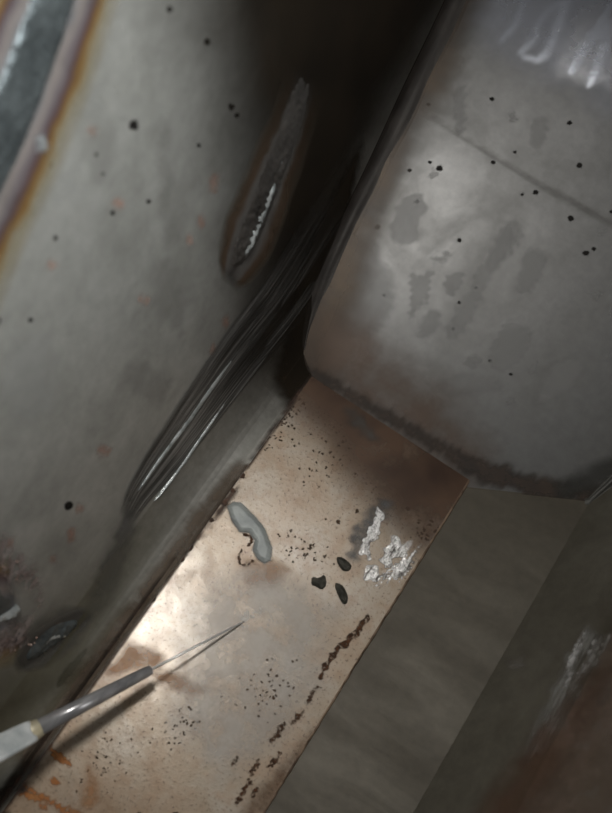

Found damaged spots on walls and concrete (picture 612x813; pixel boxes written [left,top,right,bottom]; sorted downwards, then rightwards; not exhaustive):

leakage [495,0,612,84]
rust [46,465,243,715]
leakage [565,634,610,683]
rust [19,725,72,766]
rust [19,785,81,813]